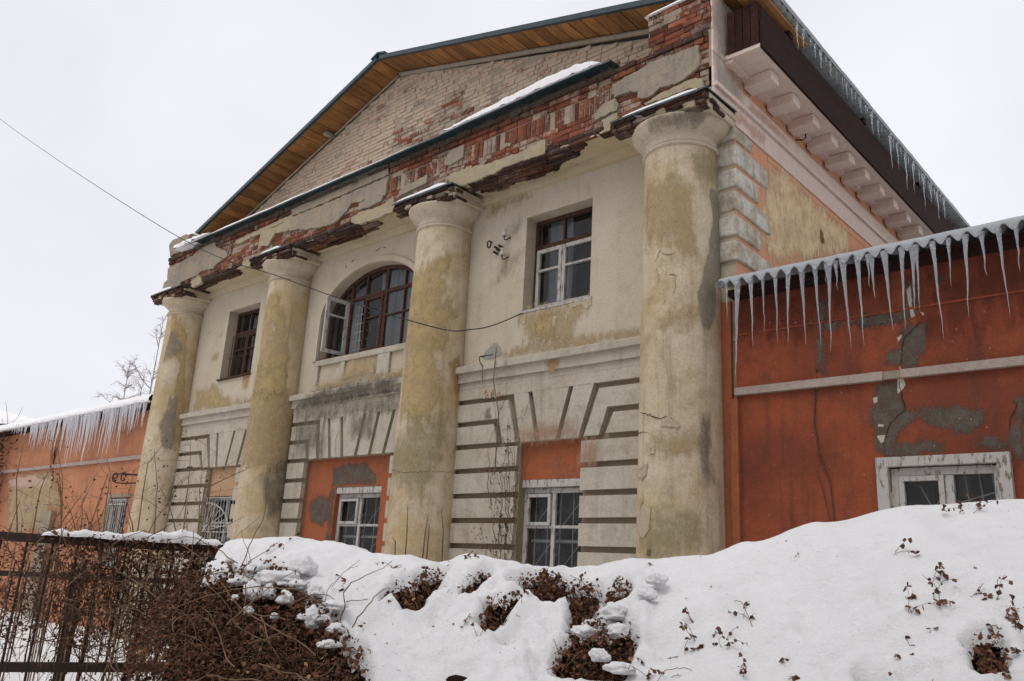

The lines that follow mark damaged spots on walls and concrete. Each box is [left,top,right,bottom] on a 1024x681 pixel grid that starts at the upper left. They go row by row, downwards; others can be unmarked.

spalling [151,30,797,306]